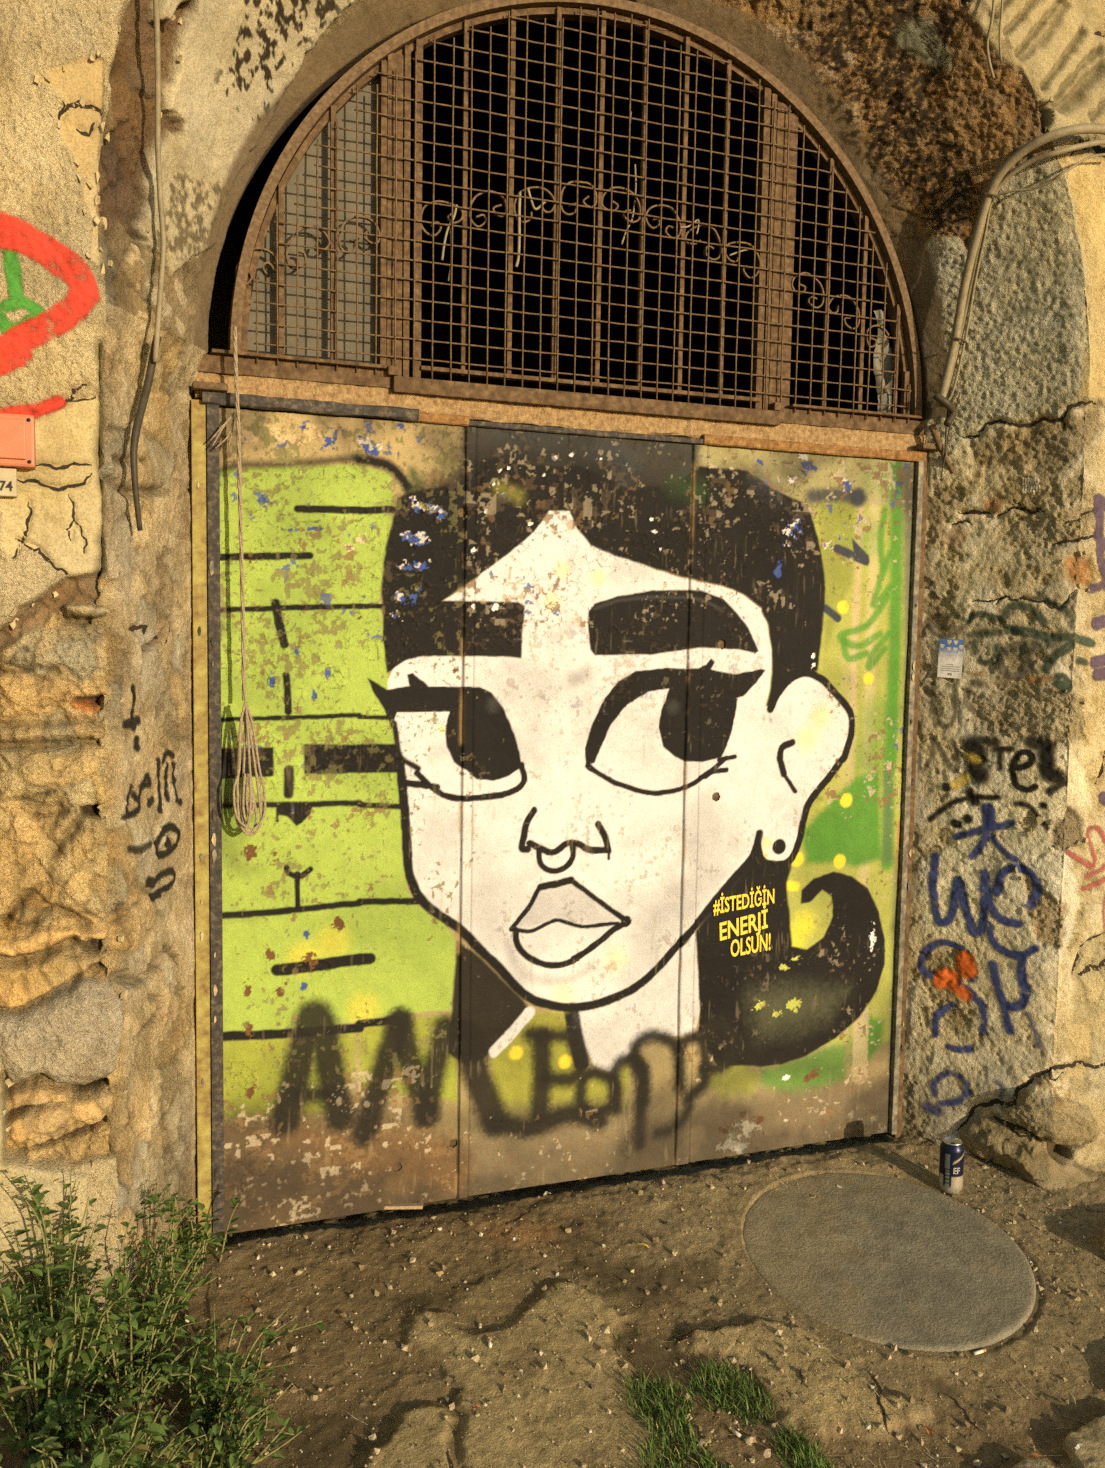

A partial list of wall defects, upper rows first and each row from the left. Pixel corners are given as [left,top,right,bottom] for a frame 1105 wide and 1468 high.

flaking render [34,0,193,275]
water stain [226,0,340,119]
water stain [793,0,974,229]
crack [961,400,1096,439]